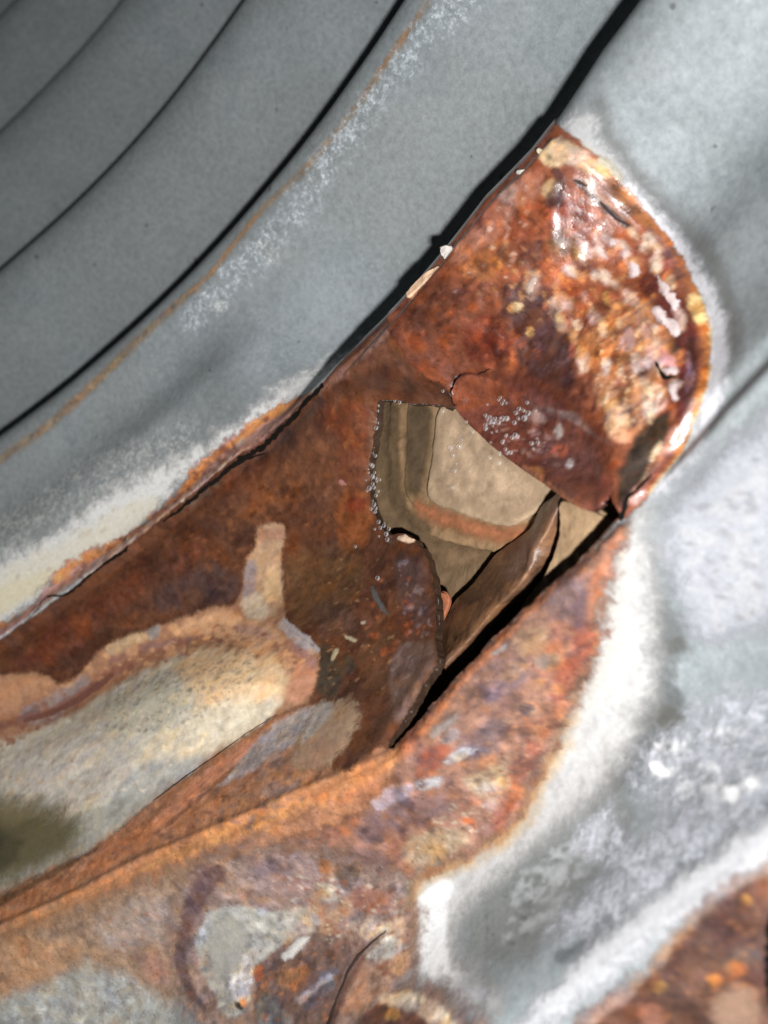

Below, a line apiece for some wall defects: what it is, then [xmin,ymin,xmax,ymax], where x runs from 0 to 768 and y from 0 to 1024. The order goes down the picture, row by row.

corrosion [406,266,439,298]
leakage [0,337,360,624]
crack [163,384,324,522]
crack [32,546,128,615]
leakage [388,106,768,1024]
corrosion [0,302,628,1024]
corrosion [577,863,768,1024]